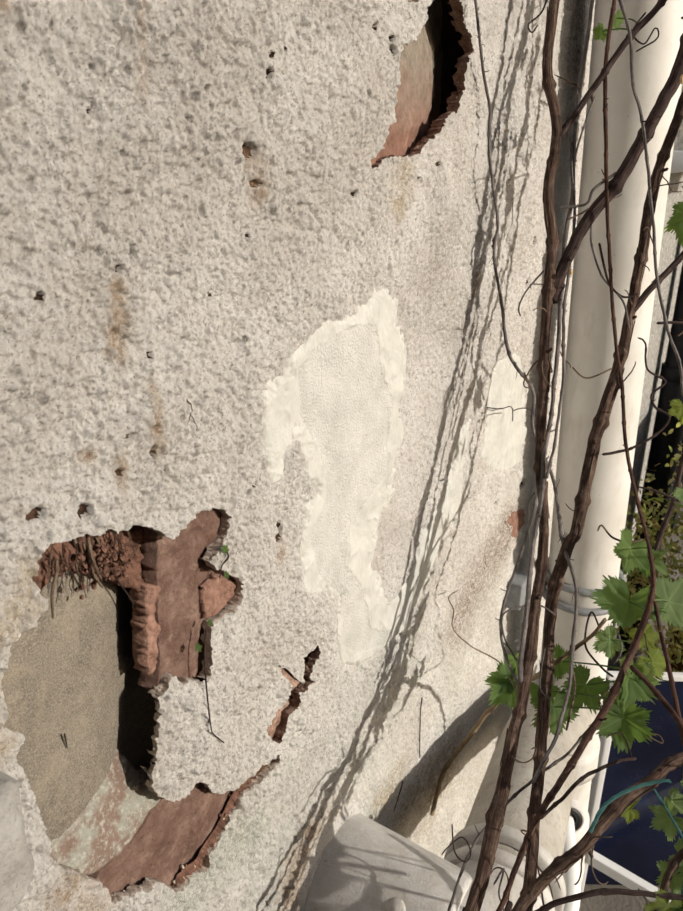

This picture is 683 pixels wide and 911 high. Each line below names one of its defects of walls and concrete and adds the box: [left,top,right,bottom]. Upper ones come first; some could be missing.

spalling [370,0,474,168]
spalling [1,507,280,905]
crack [267,646,321,744]